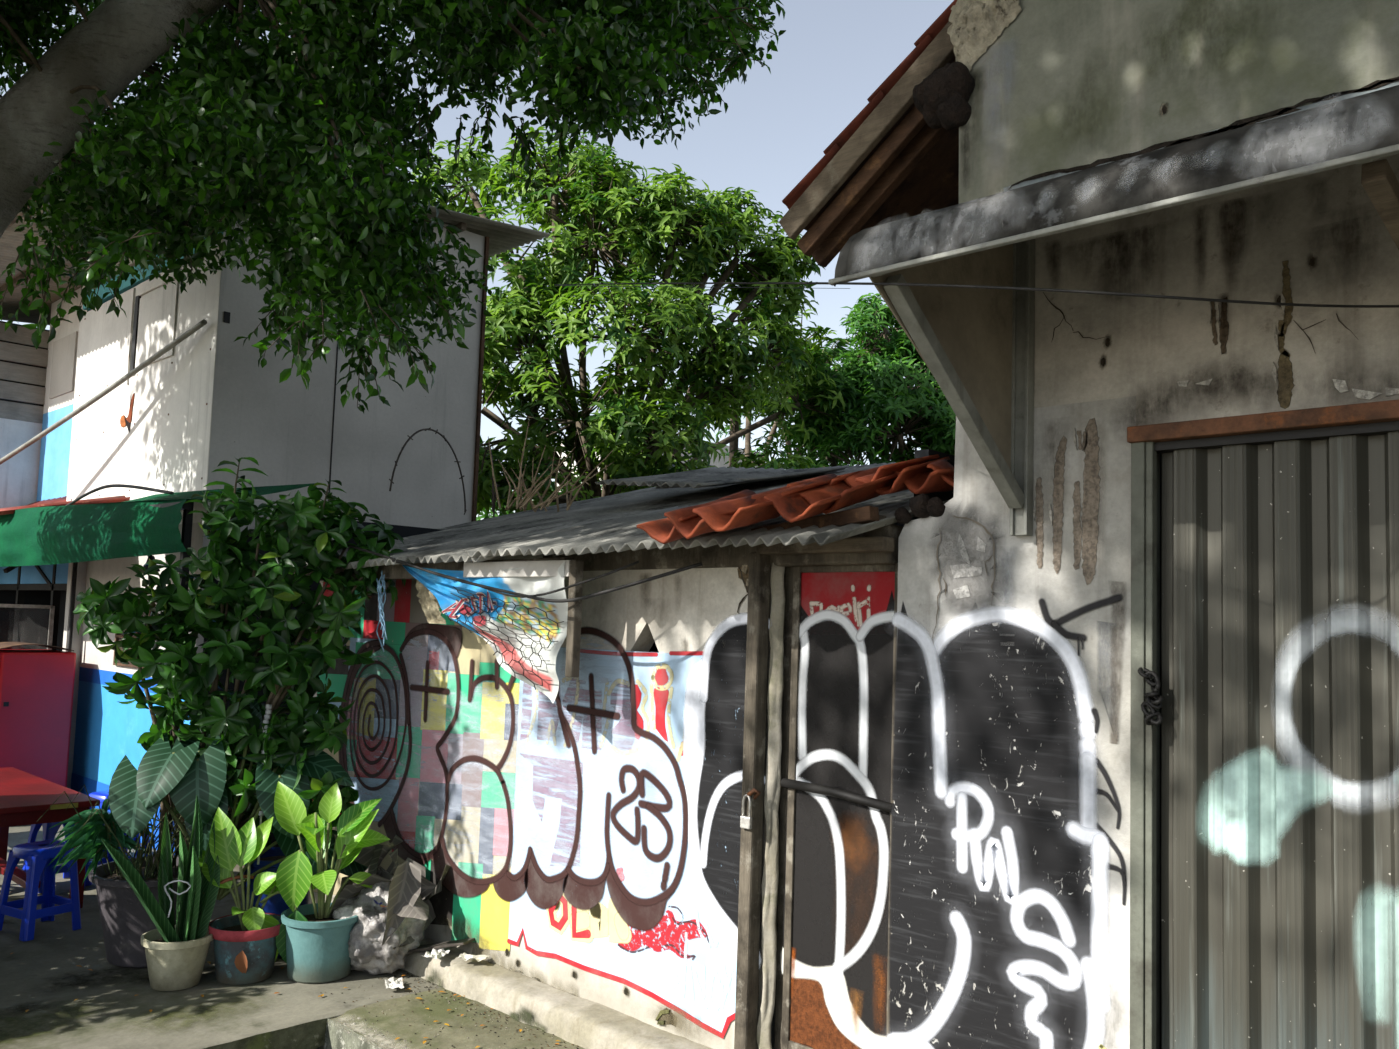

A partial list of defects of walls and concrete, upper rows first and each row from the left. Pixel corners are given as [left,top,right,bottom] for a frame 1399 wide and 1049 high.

spalling [947,0,1022,72]
damp [1082,180,1099,197]
crack [1043,292,1108,340]
flaking render [1210,298,1229,354]
flaking render [1272,260,1294,409]
damp [1129,371,1270,427]
flaking render [1033,418,1101,585]